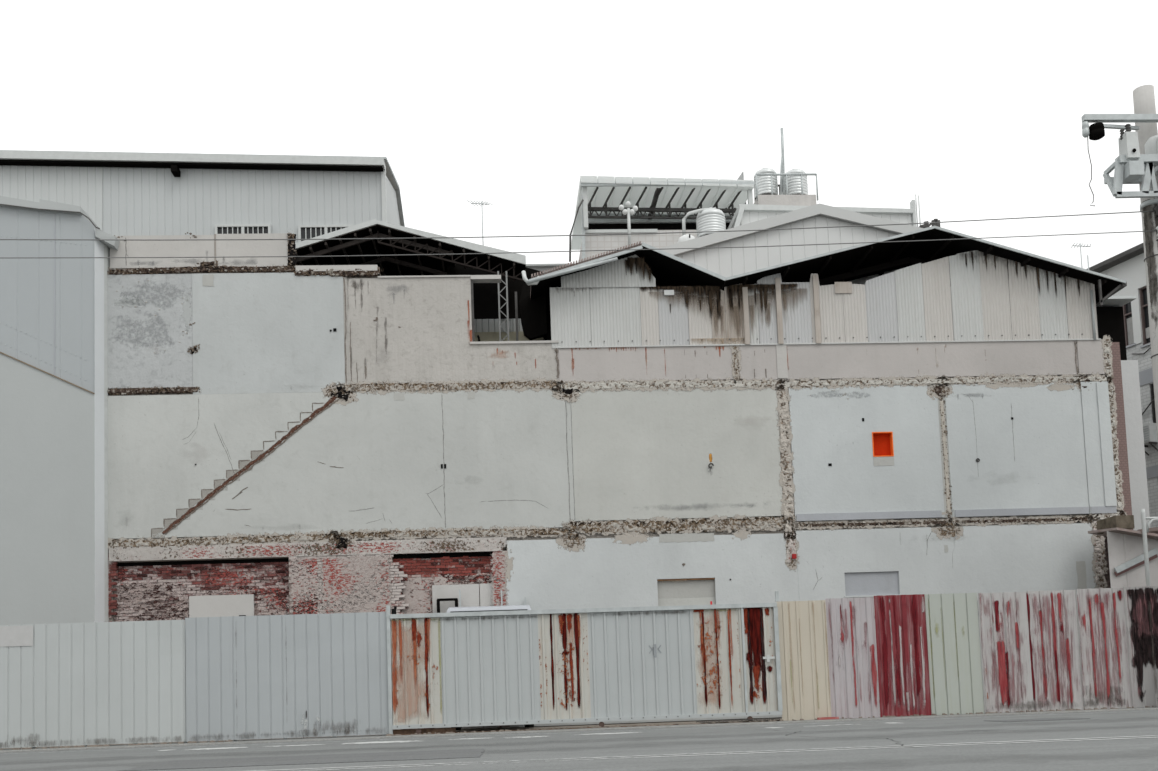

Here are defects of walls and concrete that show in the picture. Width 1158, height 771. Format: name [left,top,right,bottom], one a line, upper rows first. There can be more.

water stain [625,257,803,329]
spalling [107,335,1127,710]
rust [392,618,438,719]
rust [539,613,589,710]
rust [693,607,773,709]
water stain [1127,587,1158,701]